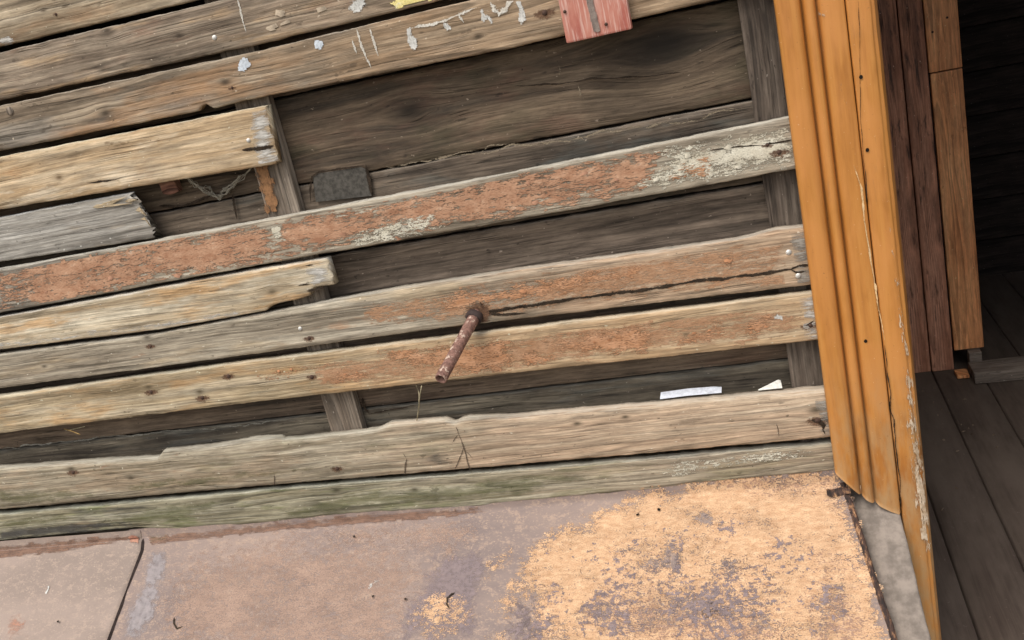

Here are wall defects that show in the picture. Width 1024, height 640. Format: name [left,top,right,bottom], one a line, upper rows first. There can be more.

peeling [389,0,432,9]
crack [709,139,792,151]
crack [859,87,867,202]
peeling [0,127,793,309]
peeling [364,244,785,324]
crack [480,264,808,316]